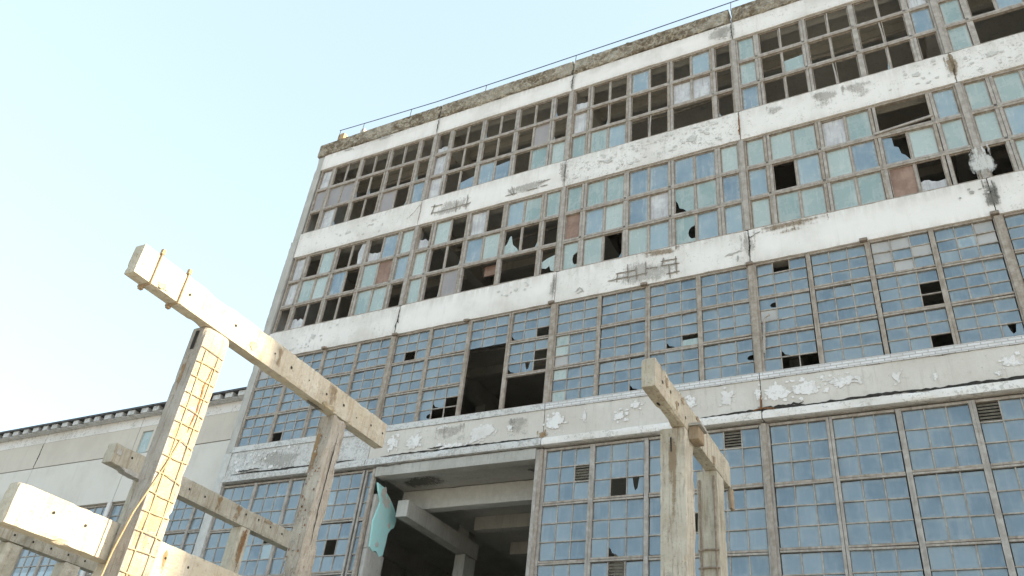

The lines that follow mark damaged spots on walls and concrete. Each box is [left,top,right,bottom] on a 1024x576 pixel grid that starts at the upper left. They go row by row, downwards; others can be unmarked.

spalling [608,256,679,282]
spalling [675,351,1024,423]
spalling [382,412,568,457]